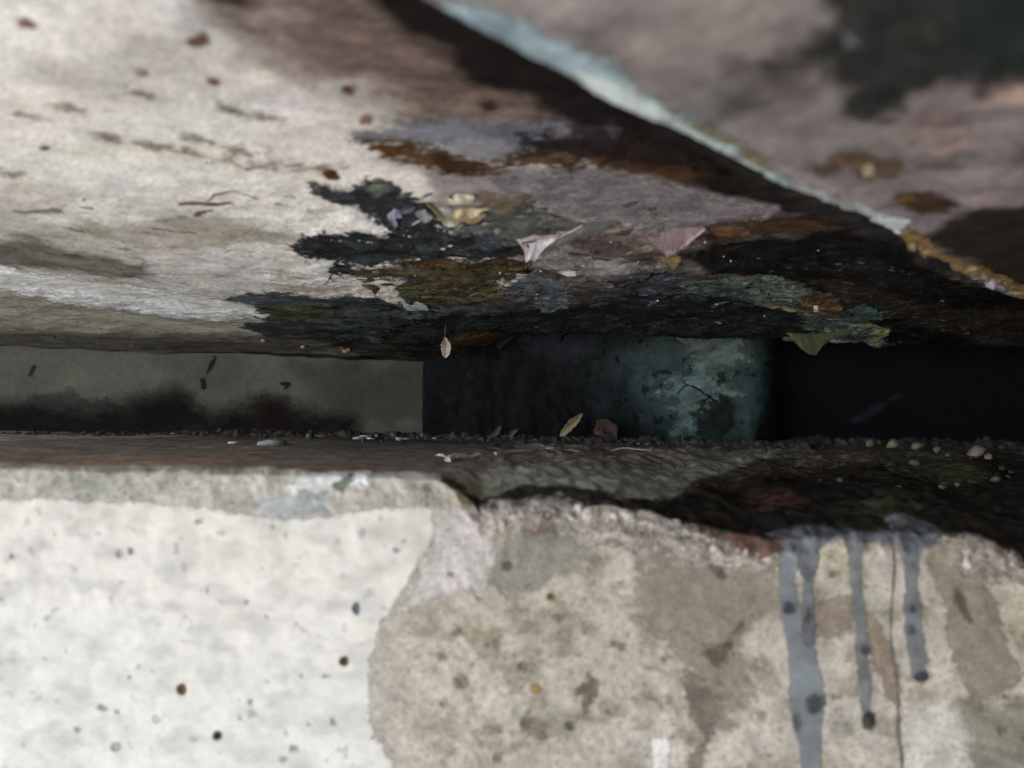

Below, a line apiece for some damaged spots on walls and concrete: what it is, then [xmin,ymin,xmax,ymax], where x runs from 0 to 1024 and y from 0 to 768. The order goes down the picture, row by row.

corrosion [356,123,739,186]
peeling [911,125,971,154]
peeling [387,168,773,313]
peeling [361,266,422,295]
water stain [0,389,357,434]
peeling [0,449,1024,768]
water stain [633,512,1024,768]